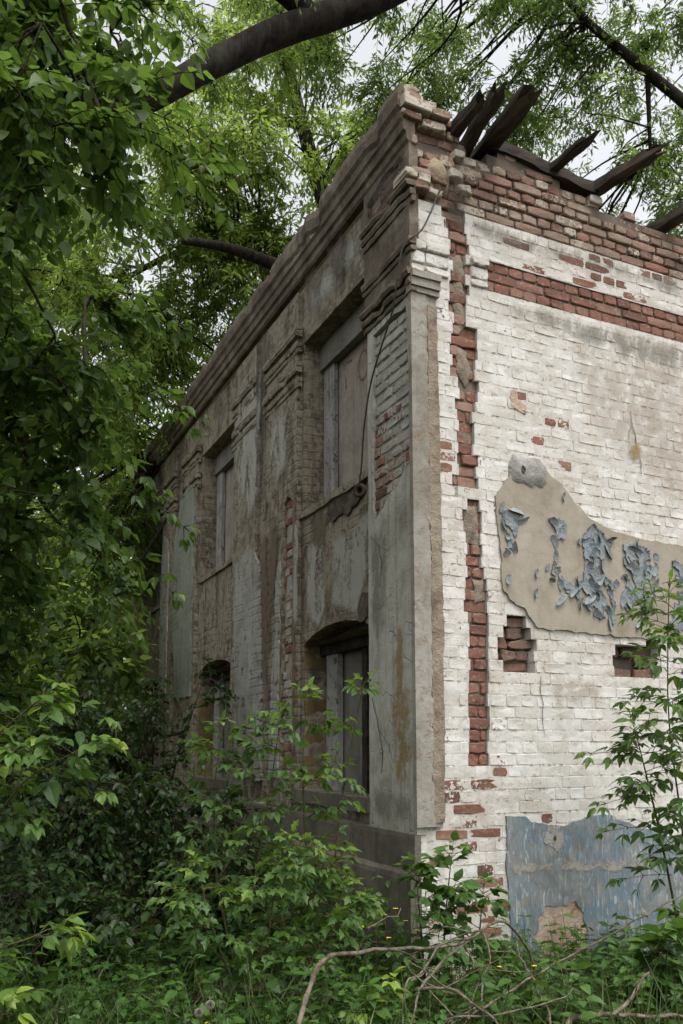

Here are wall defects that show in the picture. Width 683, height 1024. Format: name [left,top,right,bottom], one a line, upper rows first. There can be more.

flaking render [487,253,683,343]
flaking render [327,311,410,522]
spalling [427,304,507,851]
peeling [500,501,530,557]
peeling [535,517,659,631]
peeling [670,559,683,633]
spalling [497,617,532,673]
spalling [612,641,653,678]
water stain [393,629,410,781]
spalling [532,901,588,961]